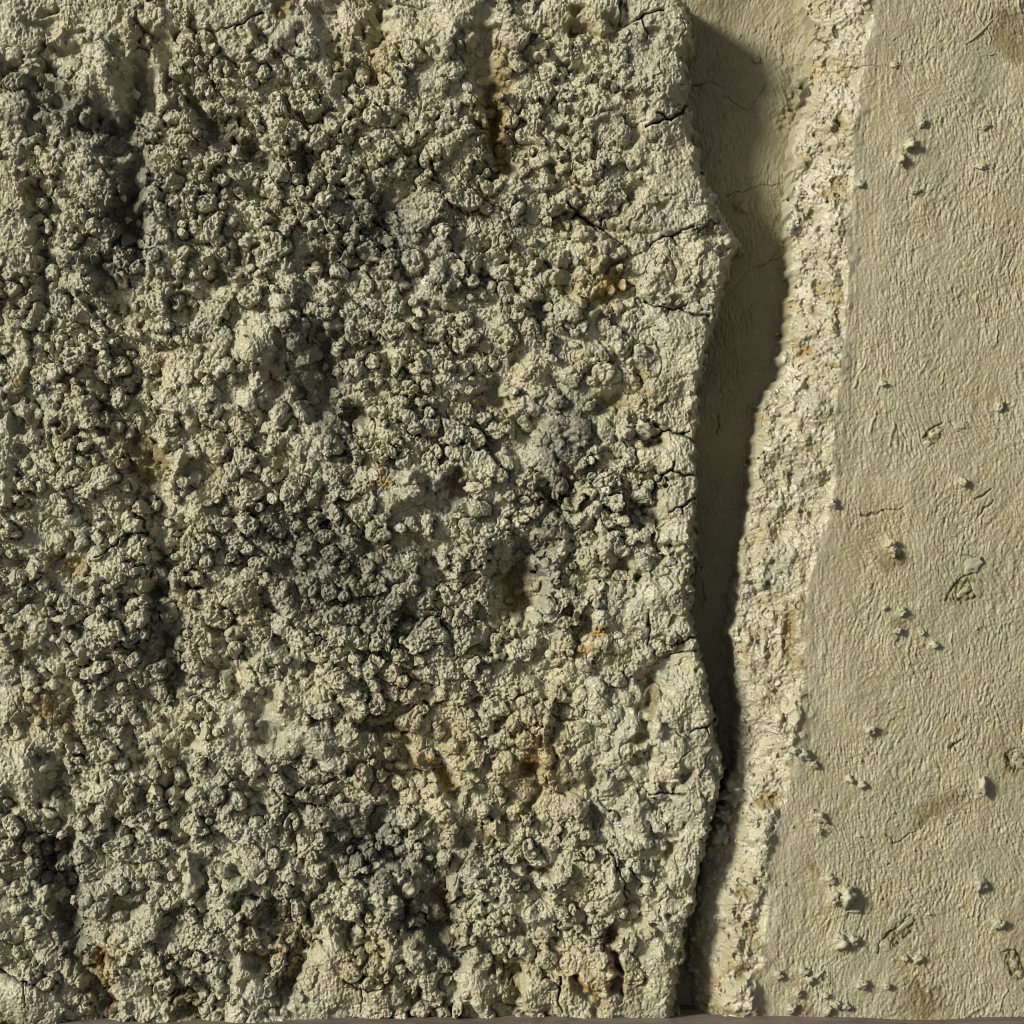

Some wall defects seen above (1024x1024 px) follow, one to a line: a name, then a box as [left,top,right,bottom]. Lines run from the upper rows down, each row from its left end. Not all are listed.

rust [490,59,507,166]
crack [645,82,764,128]
crack [567,201,618,242]
crack [644,301,710,317]
crack [653,415,721,444]
crack [651,466,695,512]
spalling [685,0,877,1018]
crack [647,614,696,657]
rust [424,755,452,792]
crack [607,849,630,899]